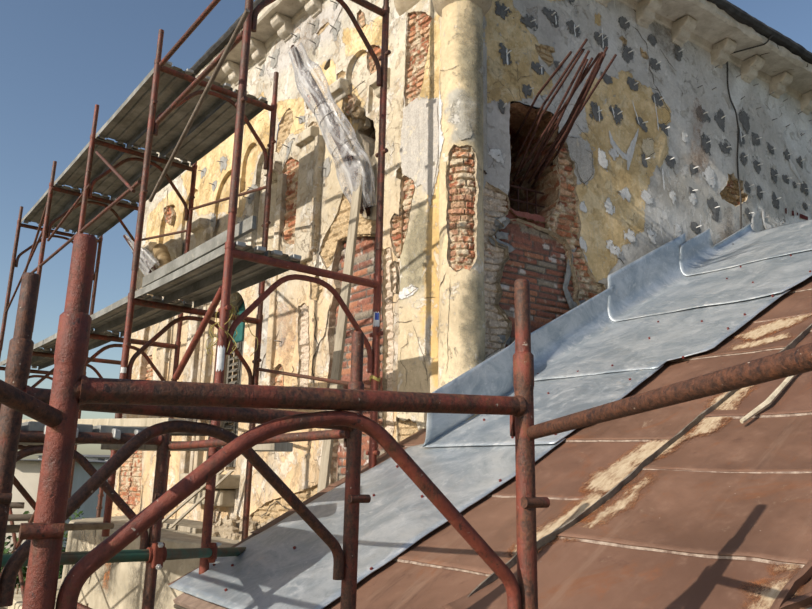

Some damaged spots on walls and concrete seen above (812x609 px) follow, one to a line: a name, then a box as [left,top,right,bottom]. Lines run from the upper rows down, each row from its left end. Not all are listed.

flaking render [535,44,555,67]
flaking render [275,108,293,153]
flaking render [281,157,299,244]
flaking render [320,186,376,270]
flaking render [382,11,512,391]
flaking render [545,137,606,306]
flaking render [720,173,748,207]
flaking render [297,276,323,387]
crack [292,303,331,383]